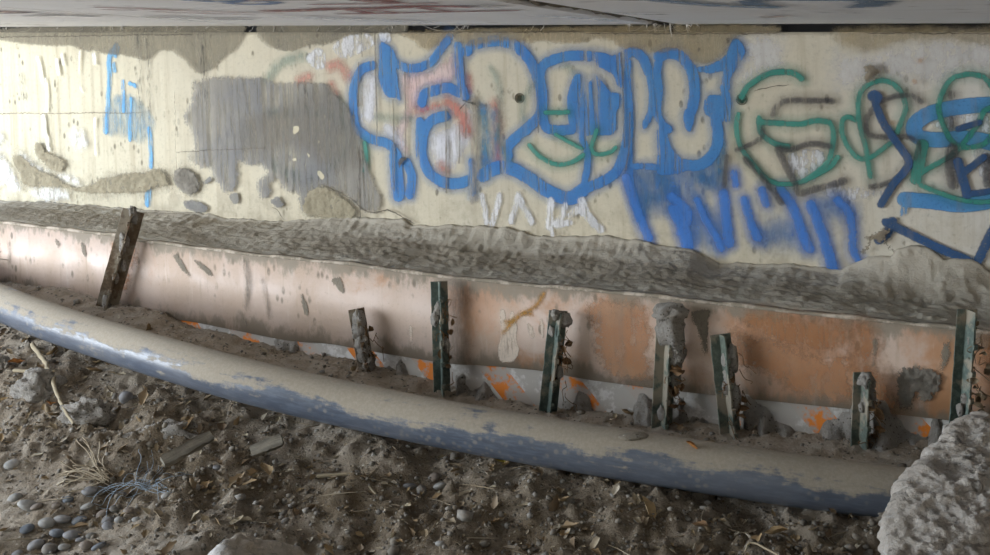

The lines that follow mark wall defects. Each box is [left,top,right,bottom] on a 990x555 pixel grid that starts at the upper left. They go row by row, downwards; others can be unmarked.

corrosion [504,292,545,332]